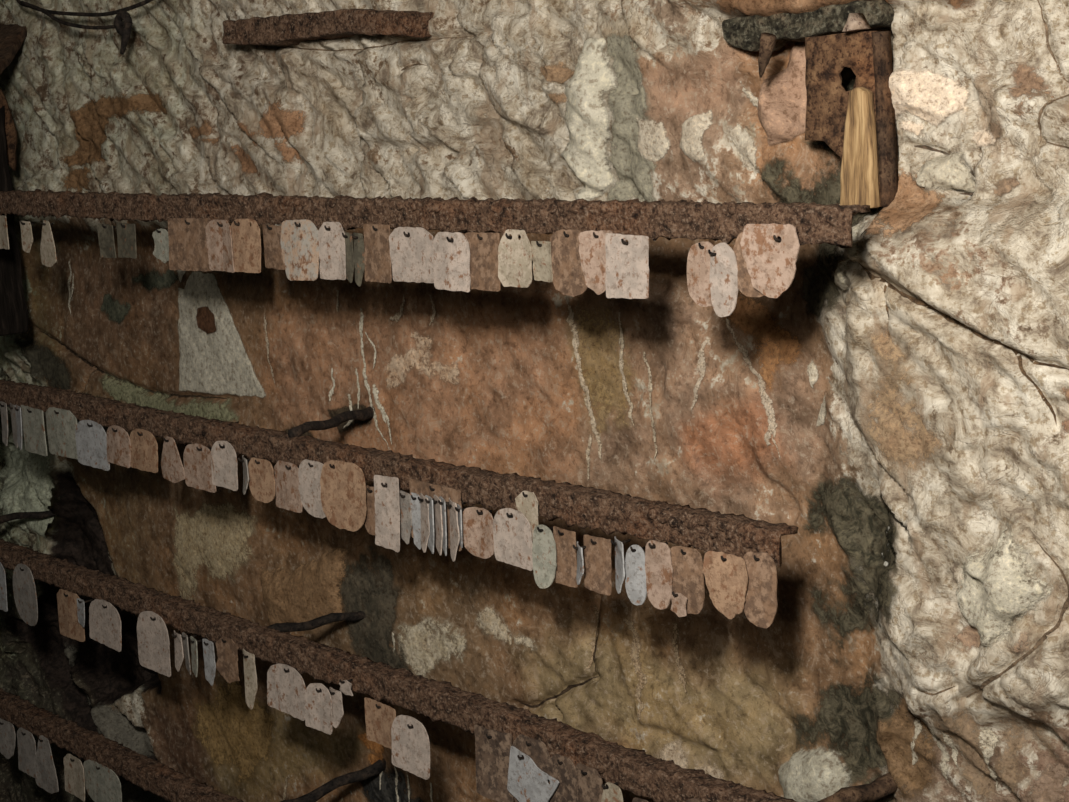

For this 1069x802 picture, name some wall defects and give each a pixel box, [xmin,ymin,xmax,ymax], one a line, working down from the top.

corrosion [572,309,632,434]
corrosion [724,291,802,388]
crack [859,263,1069,422]
crack [520,613,600,710]
water stain [804,478,897,648]
crack [921,541,1069,698]
water stain [794,672,904,785]